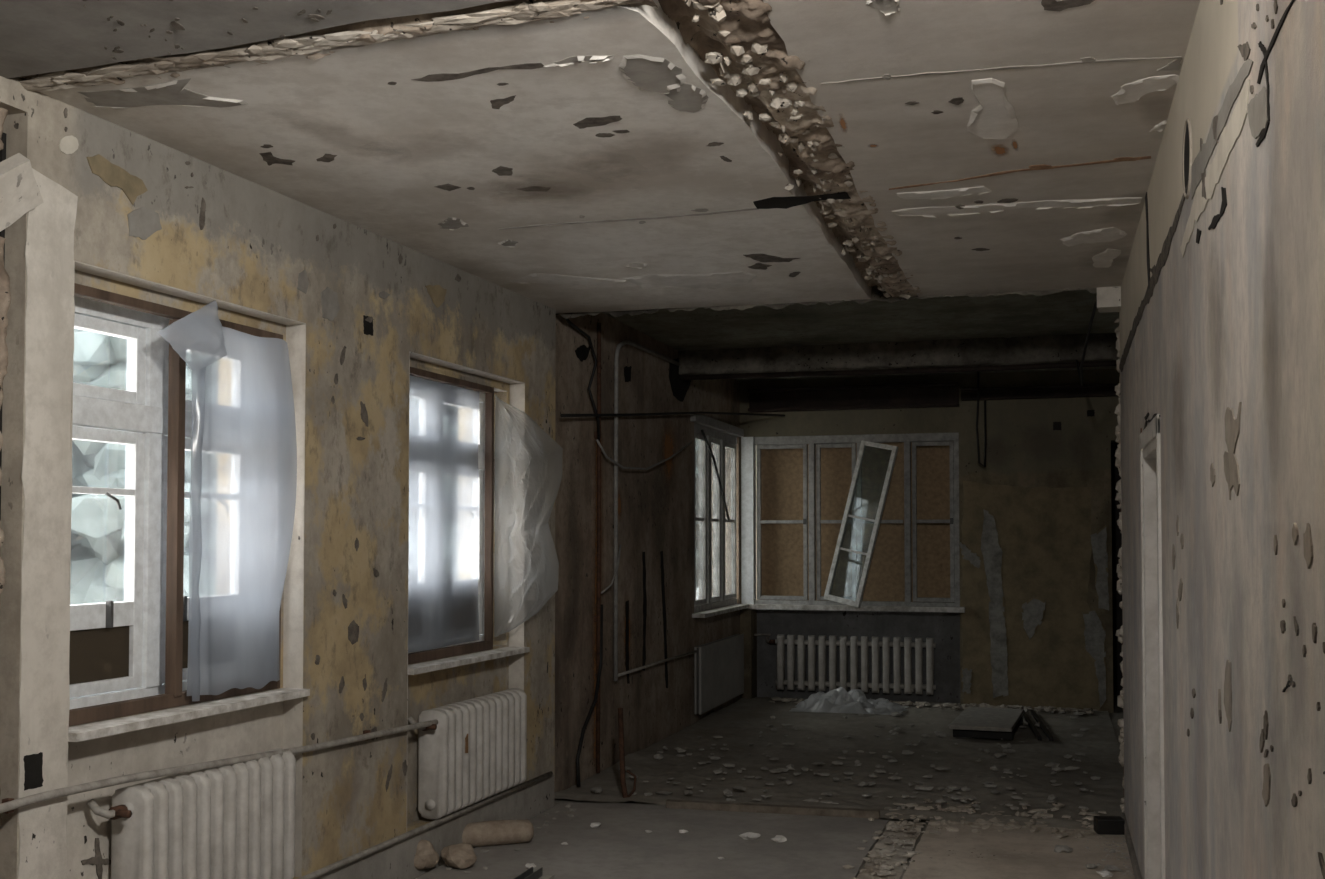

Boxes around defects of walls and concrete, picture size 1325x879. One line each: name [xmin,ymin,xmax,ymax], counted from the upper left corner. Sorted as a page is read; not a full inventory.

spalling [0,108,8,162]
spalling [18,0,1142,321]
peeling [1180,0,1278,258]
spalling [0,229,11,607]
peeling [1210,402,1242,500]
peeling [1259,710,1274,807]